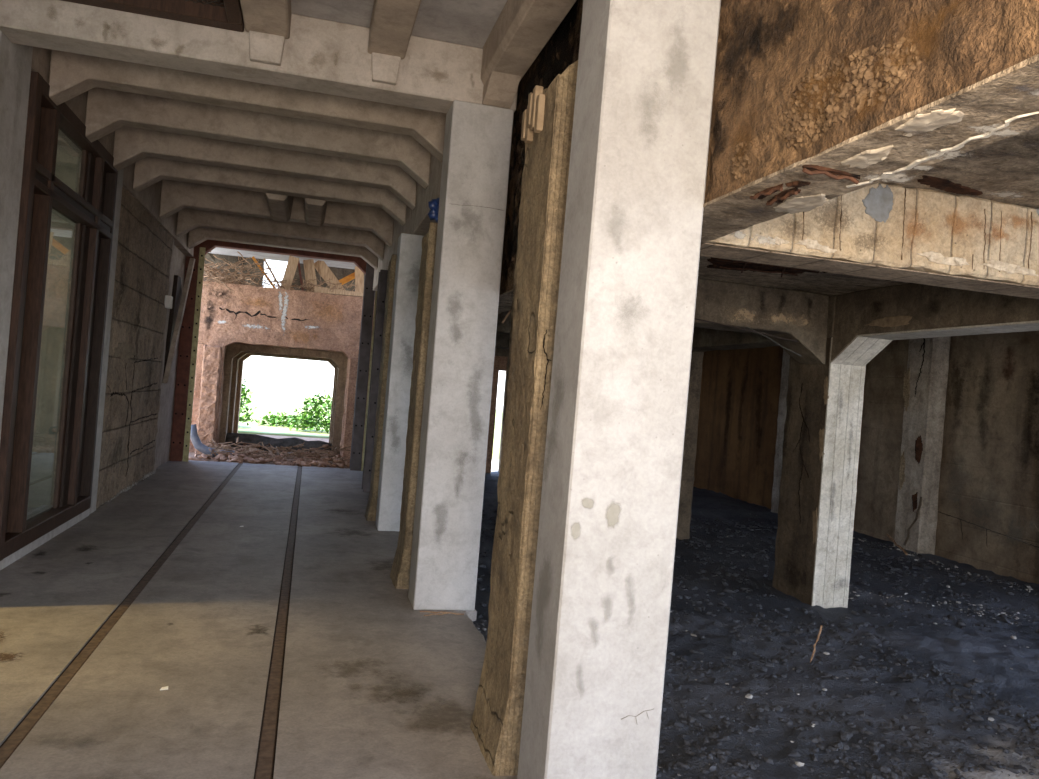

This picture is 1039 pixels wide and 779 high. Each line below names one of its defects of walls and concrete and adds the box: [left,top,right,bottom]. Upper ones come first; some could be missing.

peeling [895,108,965,137]
peeling [749,145,893,214]
spalling [917,175,983,196]
spalling [768,236,837,253]
spalling [707,257,827,277]
spalling [917,251,1038,276]
crack [219,307,310,321]
crack [915,338,925,395]